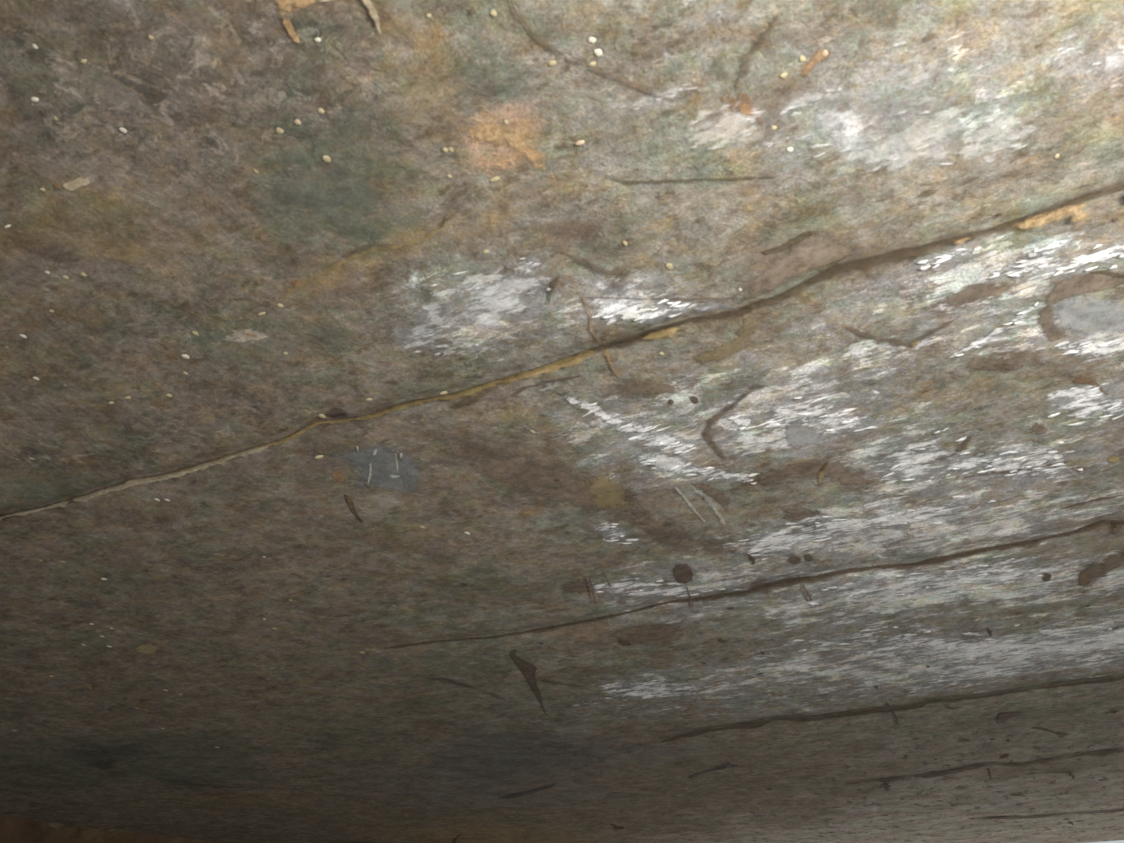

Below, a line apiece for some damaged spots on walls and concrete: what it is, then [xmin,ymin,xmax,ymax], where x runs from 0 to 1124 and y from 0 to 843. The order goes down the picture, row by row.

corrosion [276,0,315,43]
water stain [989,236,1124,280]
crack [548,276,629,377]
water stain [592,293,730,326]
crack [846,318,958,347]
water stain [567,396,758,485]
crack [704,385,766,458]
water stain [869,428,1083,485]
crack [925,435,1070,478]
water stain [1047,382,1124,426]
crack [1062,496,1118,509]
water stain [790,619,1124,690]